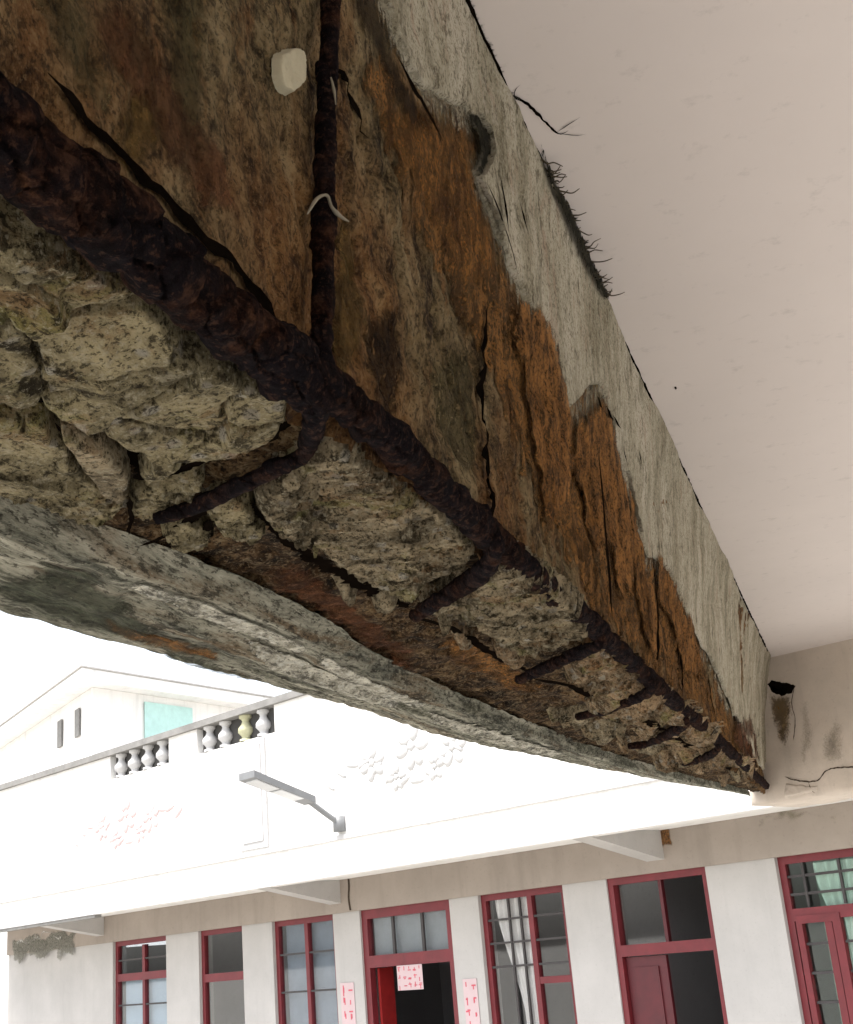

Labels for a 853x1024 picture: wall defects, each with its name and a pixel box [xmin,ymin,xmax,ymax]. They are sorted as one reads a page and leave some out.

crack [465,0,584,163]
crack [48,73,276,317]
spalling [0,194,475,614]
corrosion [332,210,367,372]
crack [476,294,496,516]
corrosion [362,54,759,768]
peeling [374,0,795,788]
crack [625,342,654,402]
corrosion [107,619,217,660]
corrosion [269,564,419,668]
peeling [128,585,565,757]
crack [786,766,853,792]